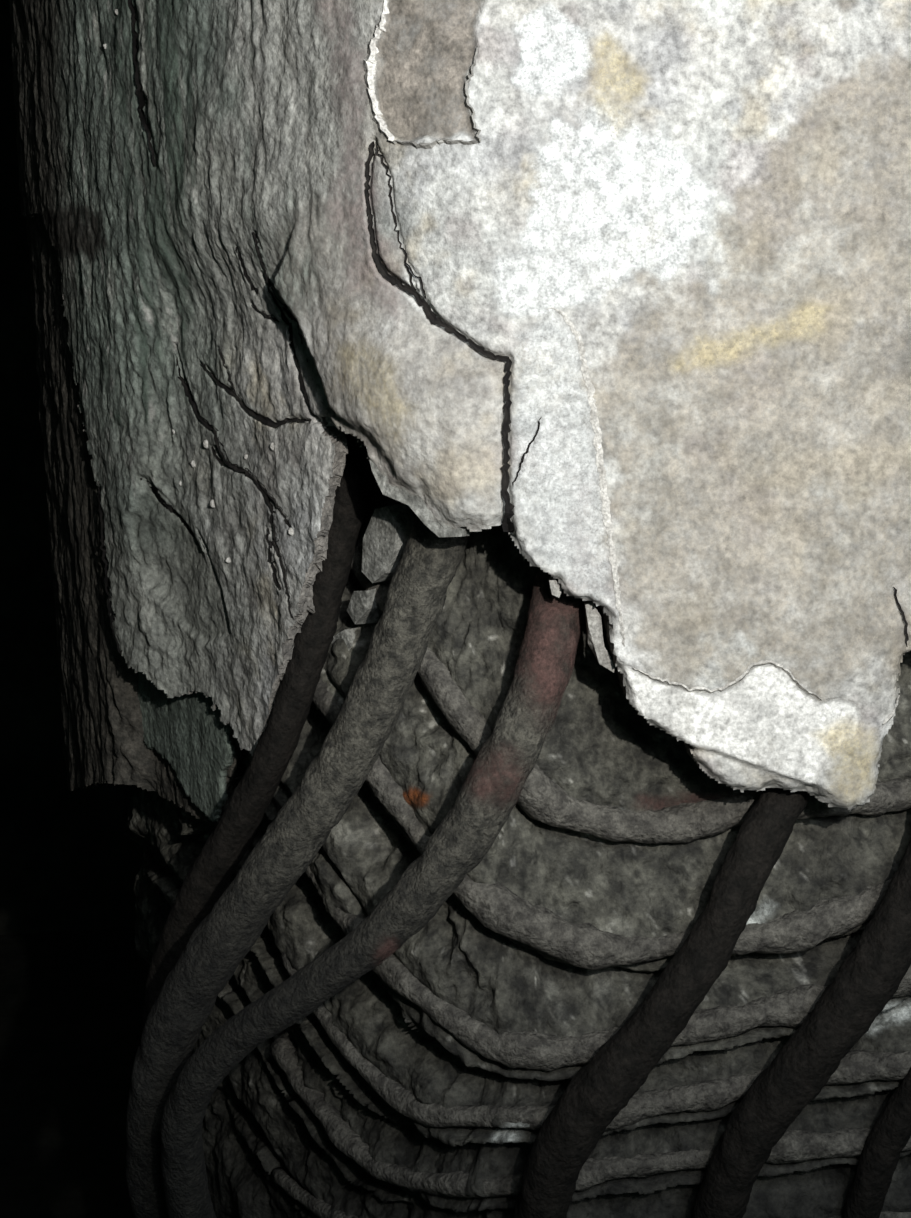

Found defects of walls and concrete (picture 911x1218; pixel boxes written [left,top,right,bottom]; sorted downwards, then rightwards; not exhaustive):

peeling [364,0,481,149]
crack [364,141,541,533]
crack [175,232,323,618]
crack [97,487,122,654]
crack [140,478,205,548]
spalling [259,417,911,938]
spalling [191,672,476,1055]
spalling [202,970,585,1218]
spalling [393,894,675,1037]
spalling [695,917,873,1011]
spalling [850,995,911,1054]
spalling [743,1156,860,1218]